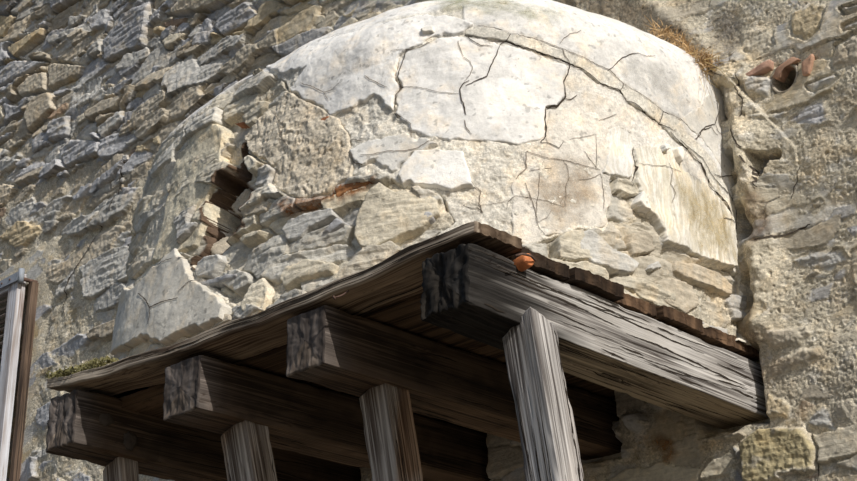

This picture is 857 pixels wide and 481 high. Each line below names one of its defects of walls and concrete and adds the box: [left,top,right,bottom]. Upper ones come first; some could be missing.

crack [63,225,102,318]
crack [138,280,196,321]
spalling [110,14,747,356]
crack [350,25,810,242]